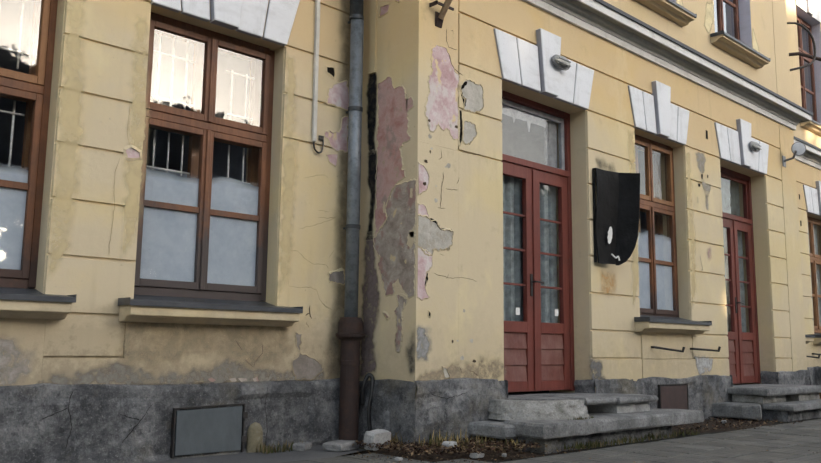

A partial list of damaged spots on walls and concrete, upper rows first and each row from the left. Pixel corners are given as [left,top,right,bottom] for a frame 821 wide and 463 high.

spalling [325,65,337,80]
flaking render [373,44,484,353]
spalling [291,332,324,381]